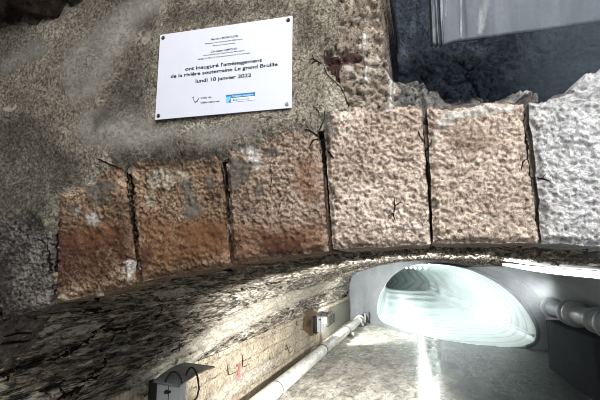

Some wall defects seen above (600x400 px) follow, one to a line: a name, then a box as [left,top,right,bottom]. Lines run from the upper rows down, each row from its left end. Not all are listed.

crack [311,55,349,107]
crack [304,105,334,247]
crack [37,238,58,278]